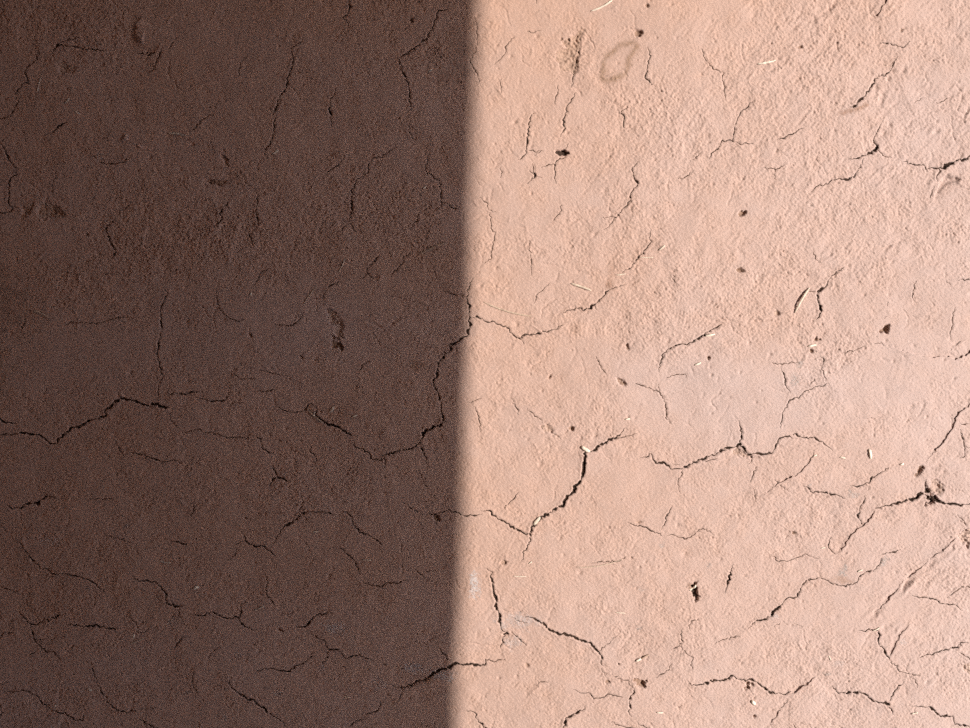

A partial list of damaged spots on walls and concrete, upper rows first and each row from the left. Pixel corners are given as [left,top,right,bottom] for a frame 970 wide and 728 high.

crack [500,51,579,181]
crack [678,49,753,179]
crack [850,42,909,108]
crack [811,125,970,198]
crack [811,252,843,319]
crack [636,325,720,423]
crack [0,197,652,672]
crack [630,357,969,540]
crack [716,539,898,643]
crack [352,570,647,728]
crack [660,620,791,695]
crack [833,629,970,727]